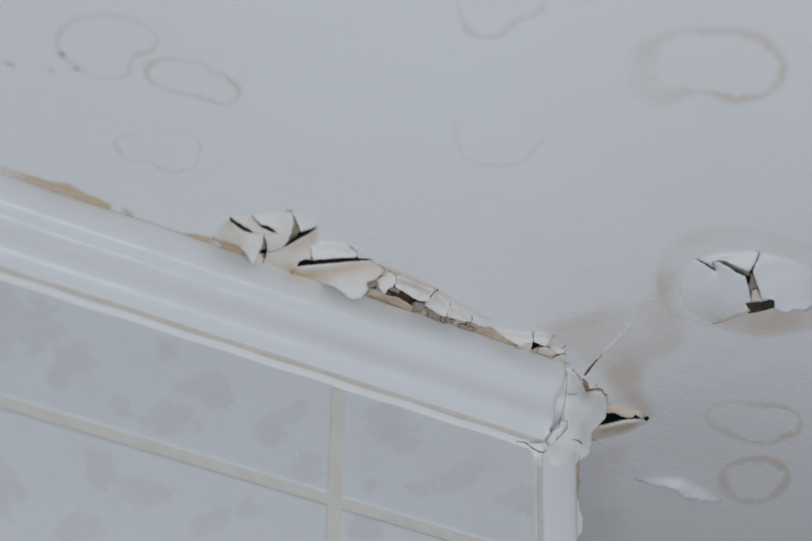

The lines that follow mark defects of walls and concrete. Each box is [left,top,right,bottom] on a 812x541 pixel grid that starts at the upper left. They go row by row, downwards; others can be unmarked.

peeling [212,210,572,364]
peeling [592,403,650,441]
peeling [634,475,722,502]